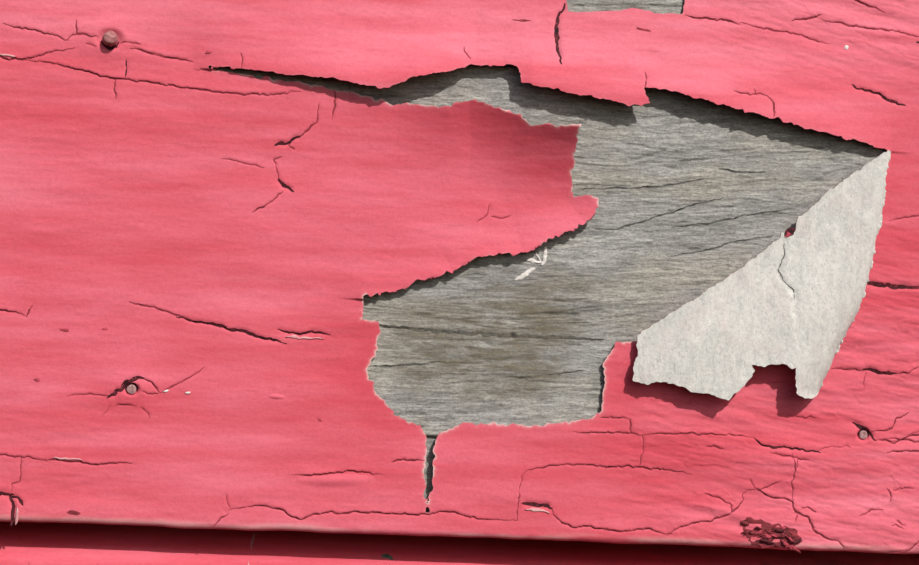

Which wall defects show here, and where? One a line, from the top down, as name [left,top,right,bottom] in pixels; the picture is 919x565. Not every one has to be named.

crack [0,20,300,97]
crack [554,3,566,64]
peeling [566,0,685,14]
crack [852,84,906,106]
crack [221,91,336,213]
peeling [205,19,892,466]
crack [131,302,330,344]
crack [69,367,204,417]
crack [0,454,134,526]
crack [211,412,919,554]
spalling [740,517,802,553]